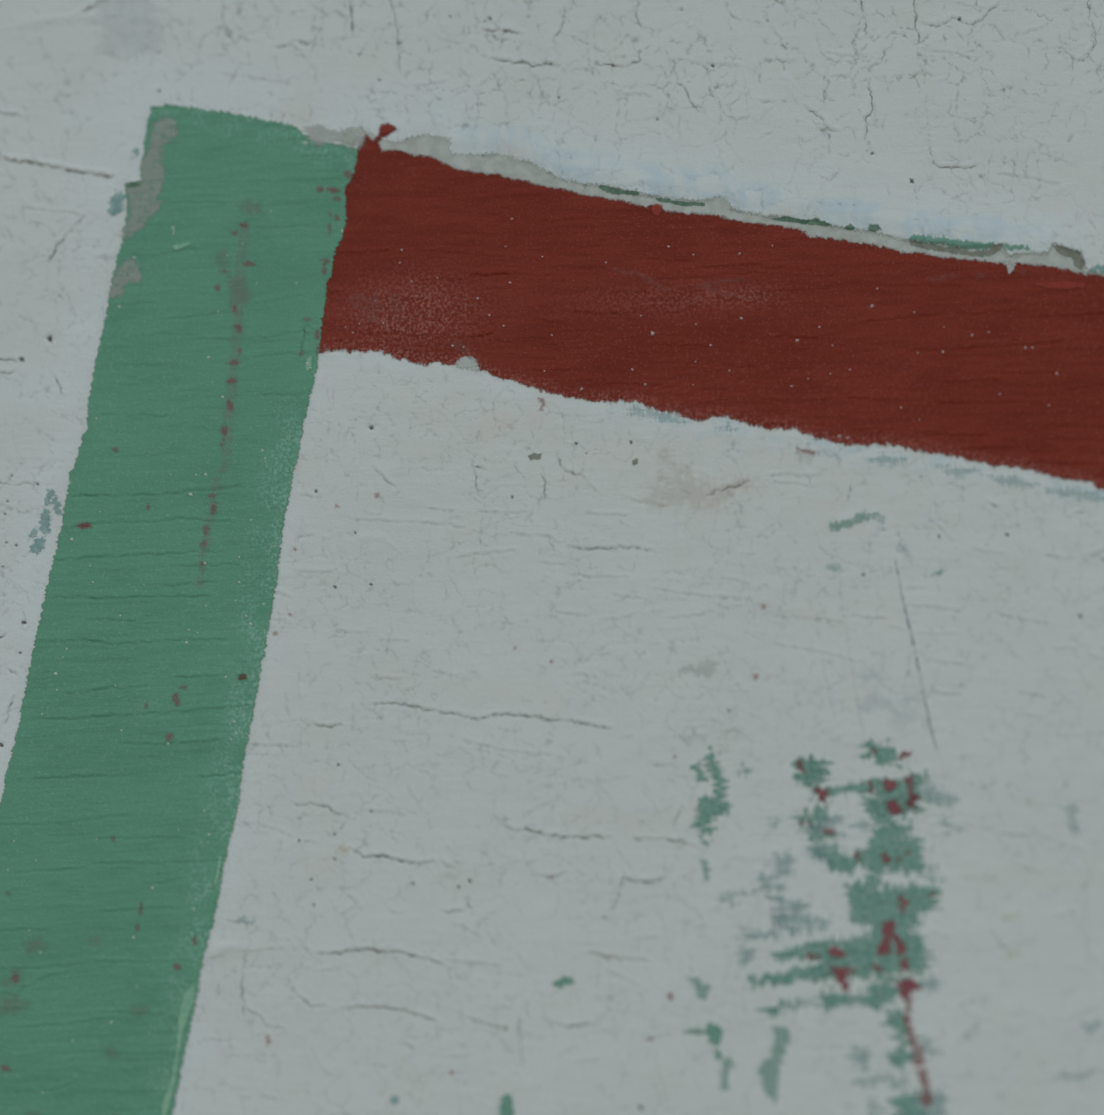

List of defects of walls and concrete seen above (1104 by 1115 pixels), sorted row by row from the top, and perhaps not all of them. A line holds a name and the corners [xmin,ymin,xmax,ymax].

peeling [108,119,177,236]
peeling [599,186,639,196]
peeling [656,198,705,206]
peeling [774,216,831,226]
peeling [910,235,1029,274]
peeling [689,745,733,845]
peeling [686,977,711,999]
peeling [683,1022,733,1088]
peeling [758,1027,790,1103]